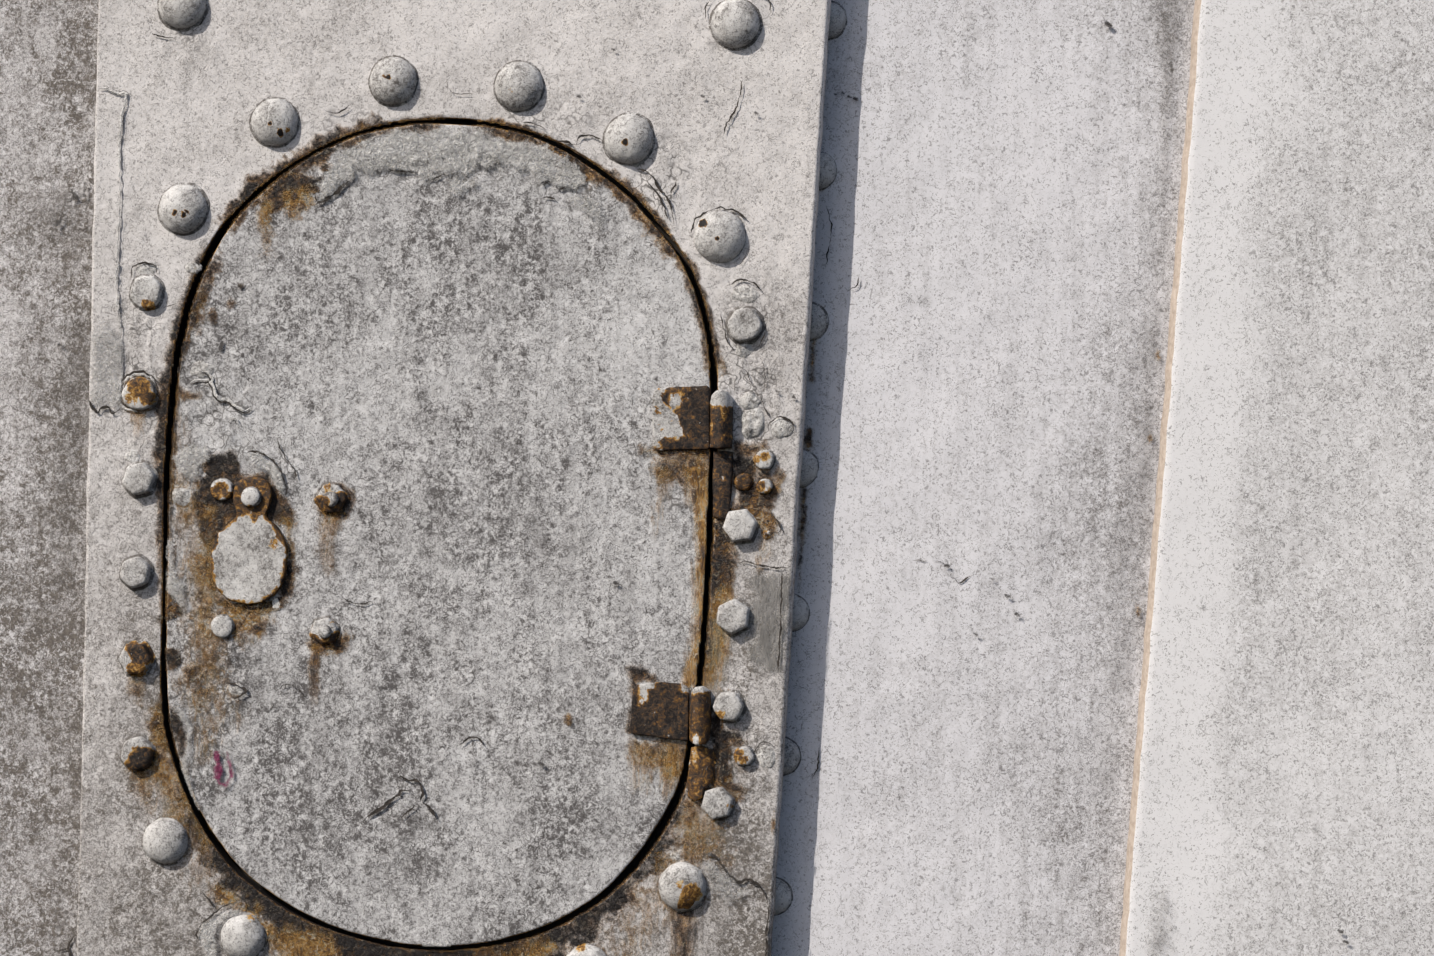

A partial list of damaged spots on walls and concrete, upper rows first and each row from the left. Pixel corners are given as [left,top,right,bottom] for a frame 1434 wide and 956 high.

corrosion [218,113,439,231]
corrosion [133,243,297,707]
corrosion [314,484,355,545]
corrosion [639,440,784,690]
corrosion [798,488,808,565]
corrosion [804,428,812,450]
corrosion [308,635,354,695]
corrosion [129,666,744,956]